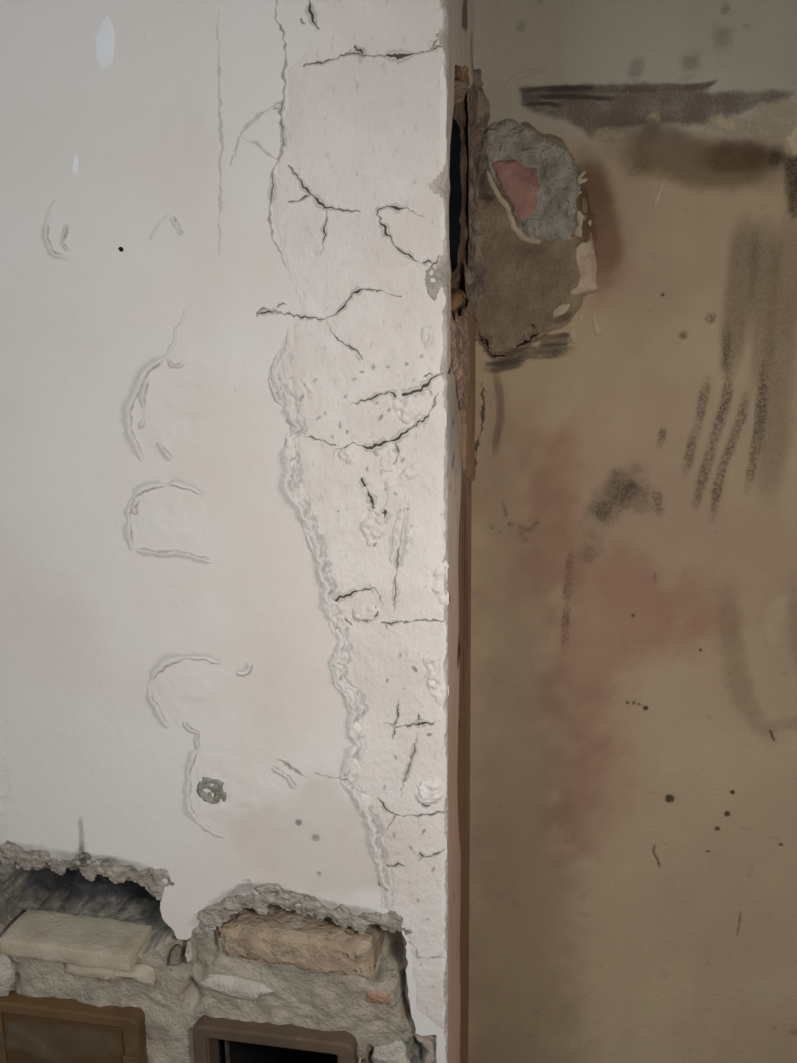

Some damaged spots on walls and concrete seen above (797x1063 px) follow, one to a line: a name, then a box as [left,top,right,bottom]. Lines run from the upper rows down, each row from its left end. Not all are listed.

crack [216,0,451,267]
water stain [623,82,714,92]
peeling [552,210,600,318]
water stain [580,174,615,263]
crack [256,287,402,359]
peeling [0,0,541,1063]
crack [307,361,486,629]
crack [277,759,348,781]
crack [377,702,447,832]